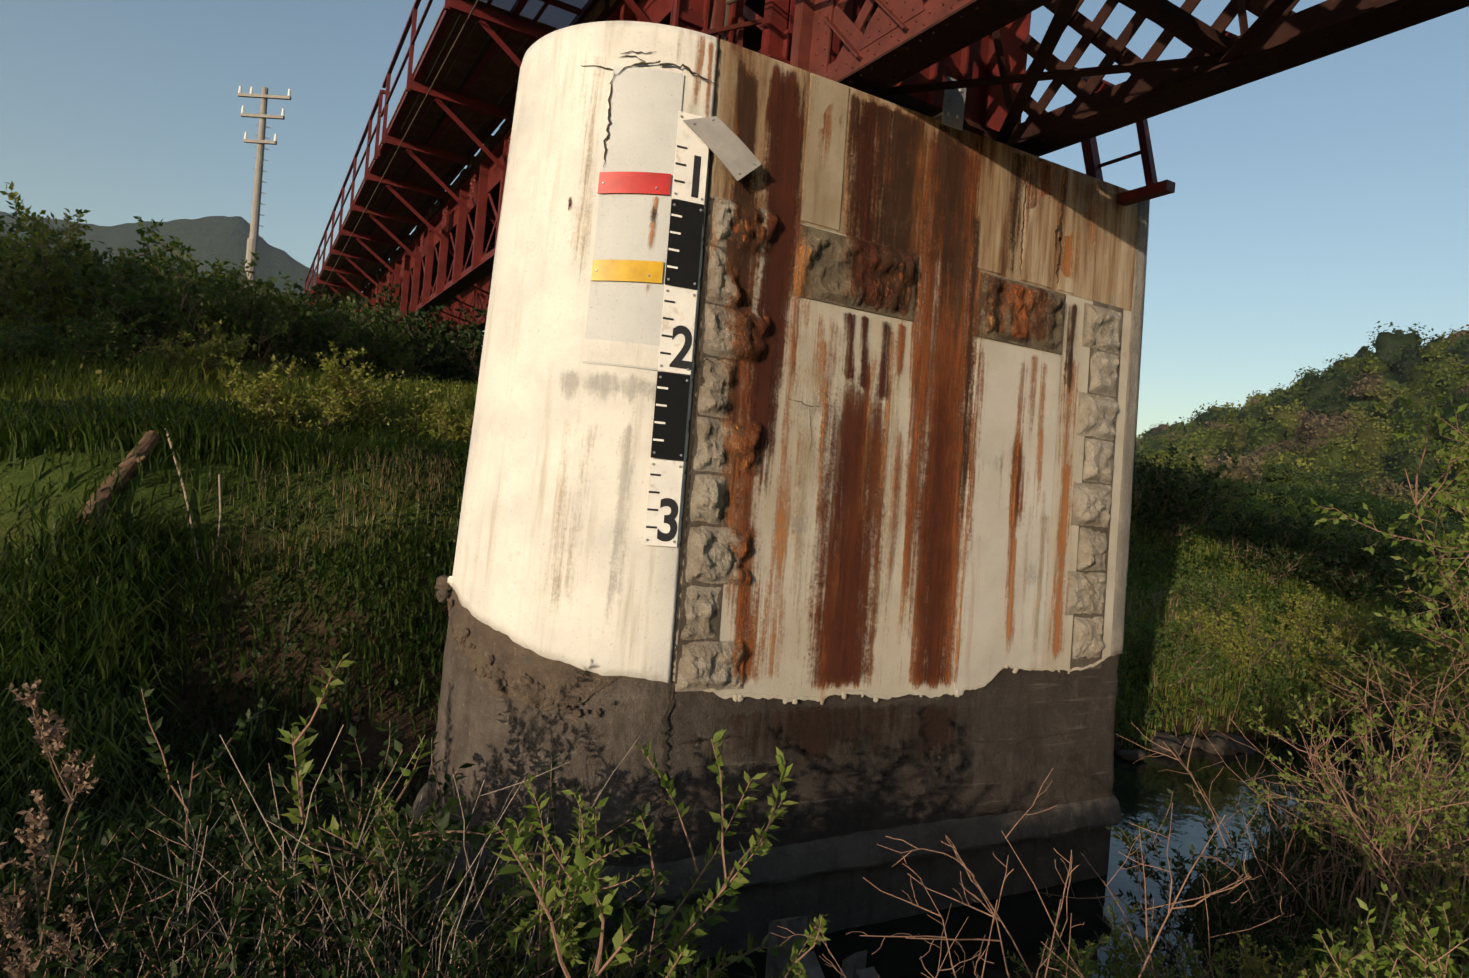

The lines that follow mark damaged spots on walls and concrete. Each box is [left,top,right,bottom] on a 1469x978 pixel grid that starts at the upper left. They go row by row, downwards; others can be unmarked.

crack [588,43,741,822]
rust [694,36,713,117]
rust [714,58,993,689]
rust [1006,357,1046,645]